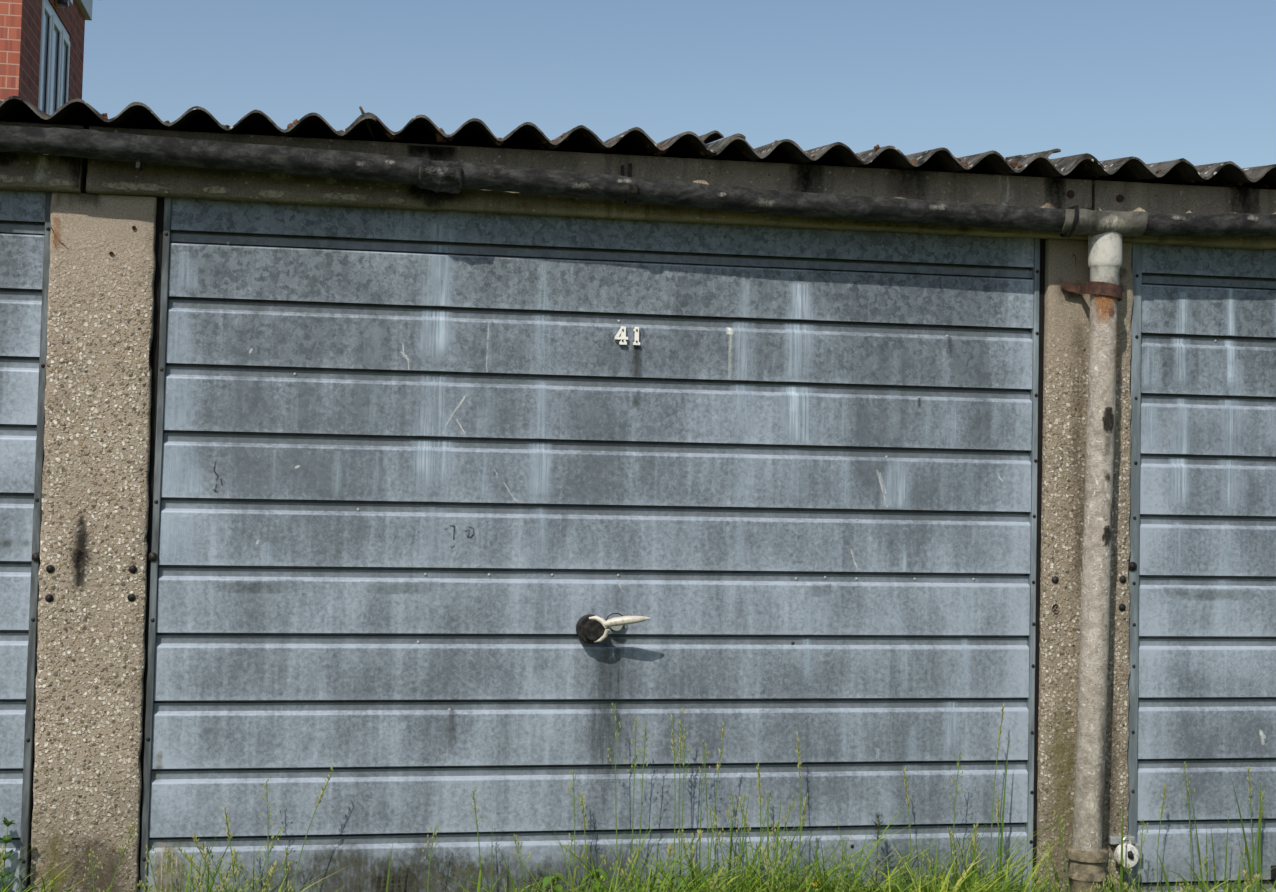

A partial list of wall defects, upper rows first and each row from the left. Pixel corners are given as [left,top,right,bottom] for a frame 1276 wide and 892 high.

leakage [409,186,457,207]
leakage [421,224,448,355]
leakage [784,283,810,441]
leakage [417,370,447,484]
leakage [71,517,87,582]